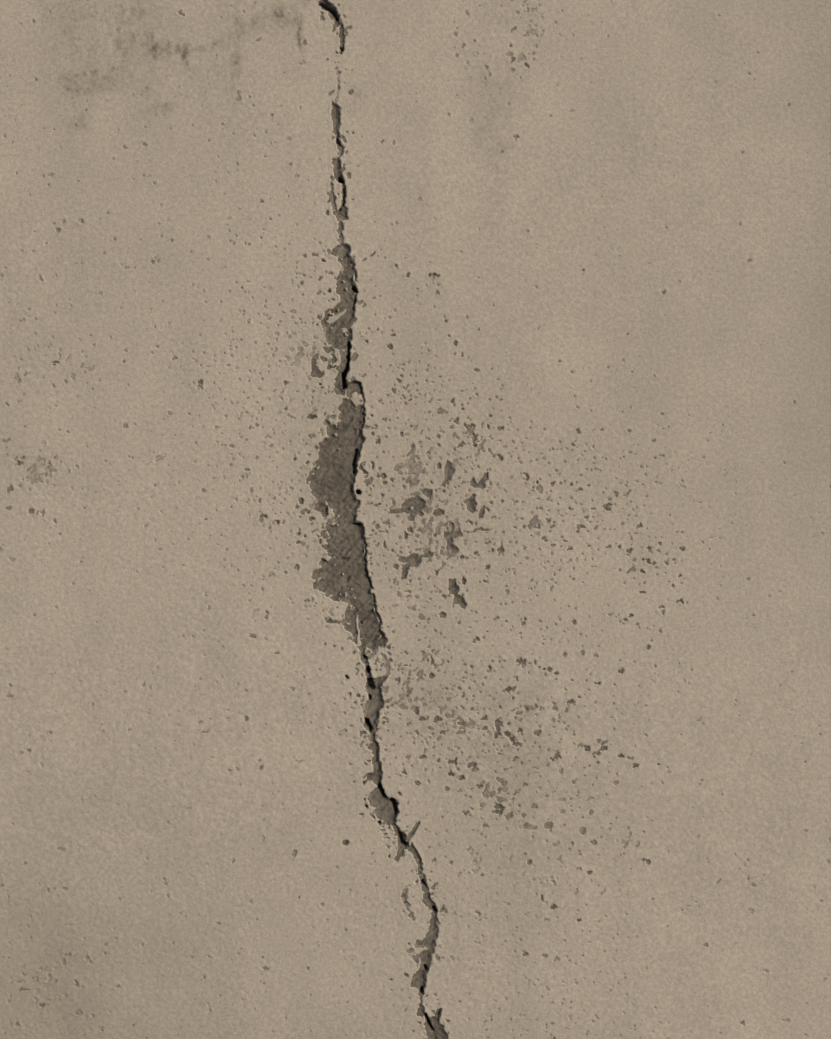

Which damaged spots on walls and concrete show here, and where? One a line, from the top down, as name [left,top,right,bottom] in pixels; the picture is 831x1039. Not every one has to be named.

crack [295,0,404,494]
hole [500,0,574,79]
crack [295,505,449,1039]
flaking render [151,209,687,1039]